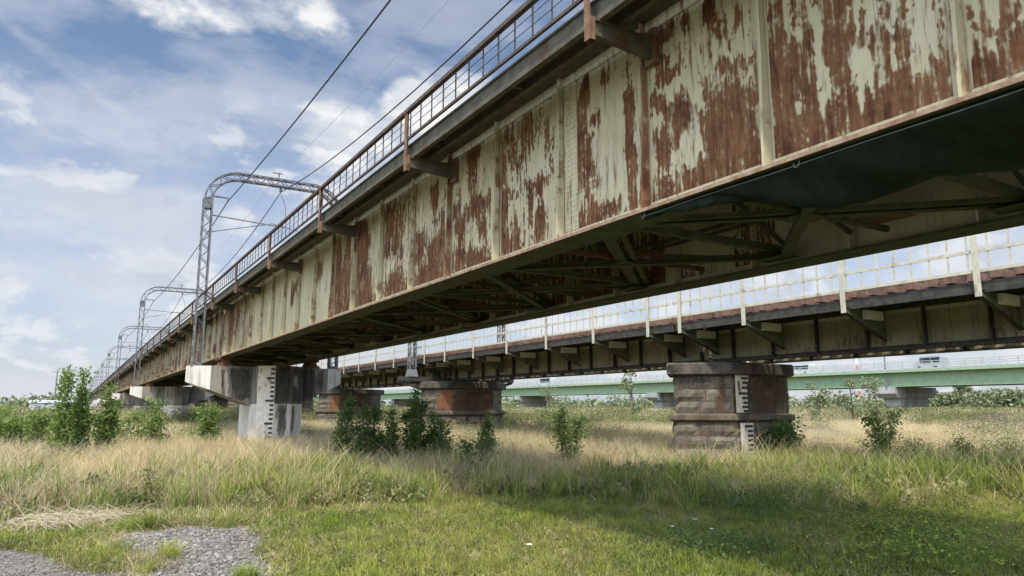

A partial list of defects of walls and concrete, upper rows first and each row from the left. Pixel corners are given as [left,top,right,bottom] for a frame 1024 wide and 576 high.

rust [966,0,1024,89]
rust [573,0,954,231]
rust [290,97,666,341]
rust [228,290,267,347]
leakage [228,367,252,401]
leakage [275,365,315,443]